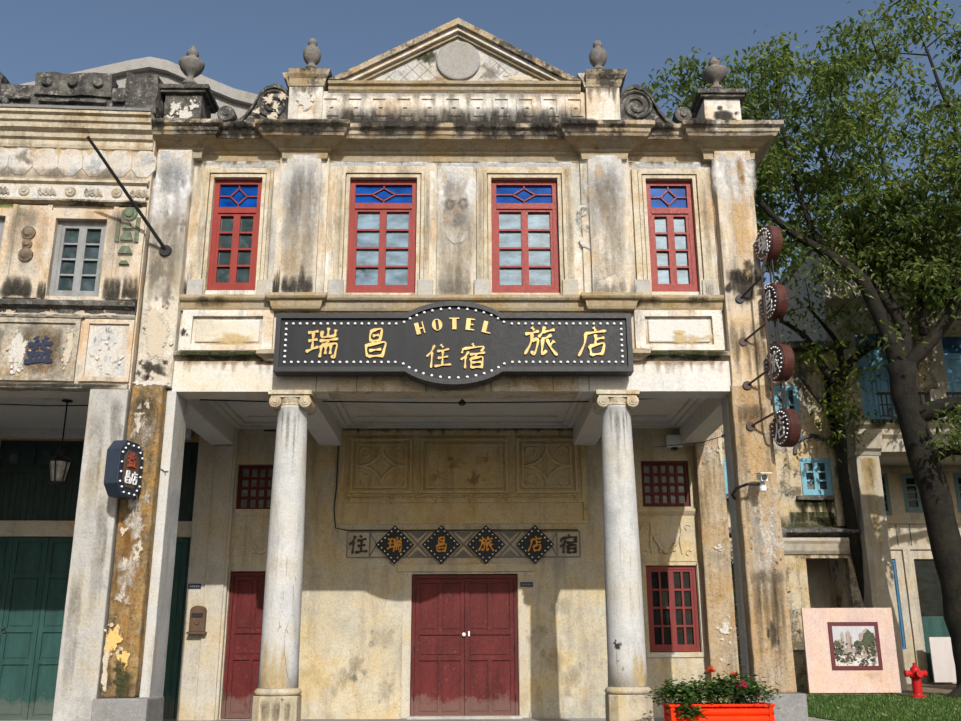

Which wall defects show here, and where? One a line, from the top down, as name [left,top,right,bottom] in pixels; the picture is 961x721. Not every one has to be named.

peeling [166,99,199,118]
leakage [142,106,775,175]
leakage [0,278,46,299]
leakage [99,279,138,301]
leakage [725,260,764,302]
peeling [5,329,31,374]
peeling [61,326,75,370]
peeling [74,310,124,377]
peeling [134,402,151,446]
peeling [114,494,149,602]
peeling [101,623,130,692]